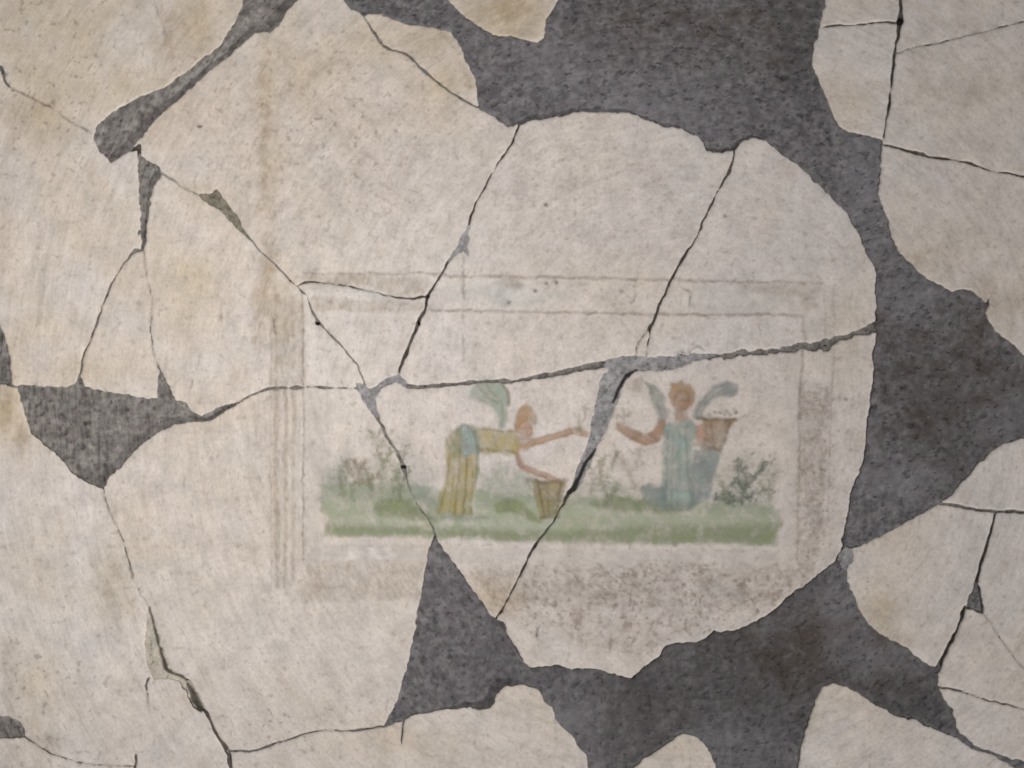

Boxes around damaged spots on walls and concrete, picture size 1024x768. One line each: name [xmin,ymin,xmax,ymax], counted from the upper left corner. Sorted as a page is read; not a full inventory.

crack [131,144,141,155]
crack [367,22,475,107]
crack [468,127,519,225]
crack [826,0,1024,178]
crack [81,248,144,373]
crack [235,152,735,403]
crack [707,321,876,360]
crack [375,416,437,538]
crack [495,449,596,619]
crack [943,503,1024,582]
crack [145,613,404,768]
crack [938,605,1024,710]